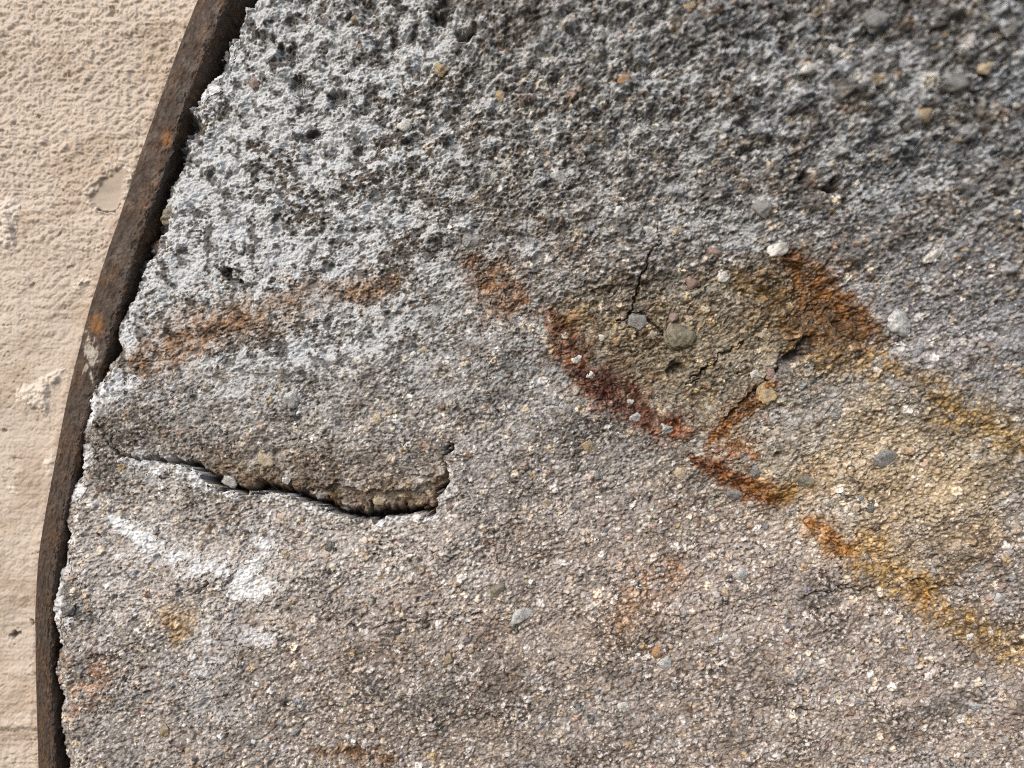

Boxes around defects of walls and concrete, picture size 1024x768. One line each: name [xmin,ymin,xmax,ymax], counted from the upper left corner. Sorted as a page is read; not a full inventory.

crack [629,223,663,312]
crack [145,442,460,531]
rust [452,236,1024,696]
rust [146,591,215,653]
rust [61,650,129,726]